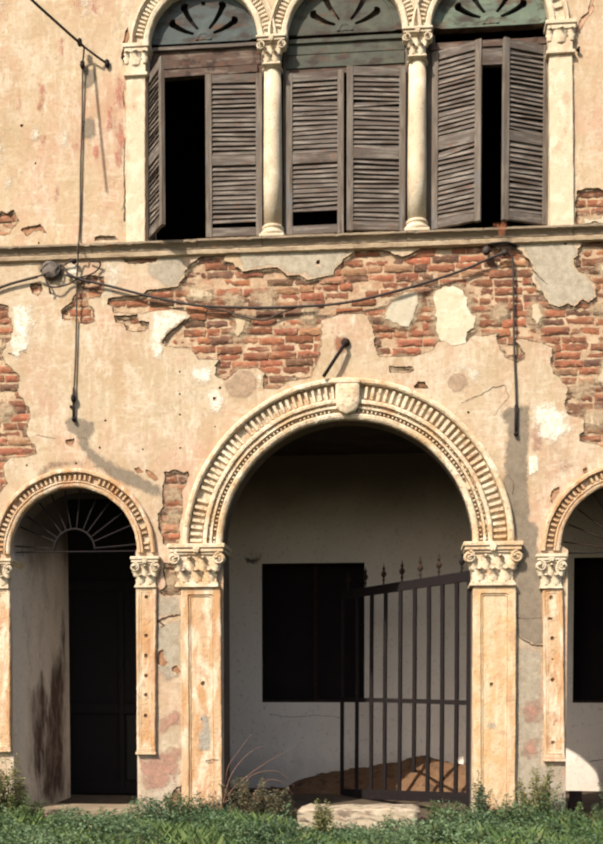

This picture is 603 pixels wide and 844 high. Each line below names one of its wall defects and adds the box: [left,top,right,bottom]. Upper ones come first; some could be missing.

flaking render [0,209,46,237]
flaking render [575,188,603,224]
flaking render [61,241,603,447]
flaking render [0,304,37,492]
flaking render [134,467,189,545]
crack [157,614,180,628]
flaking render [157,649,181,675]
damp [34,633,65,803]